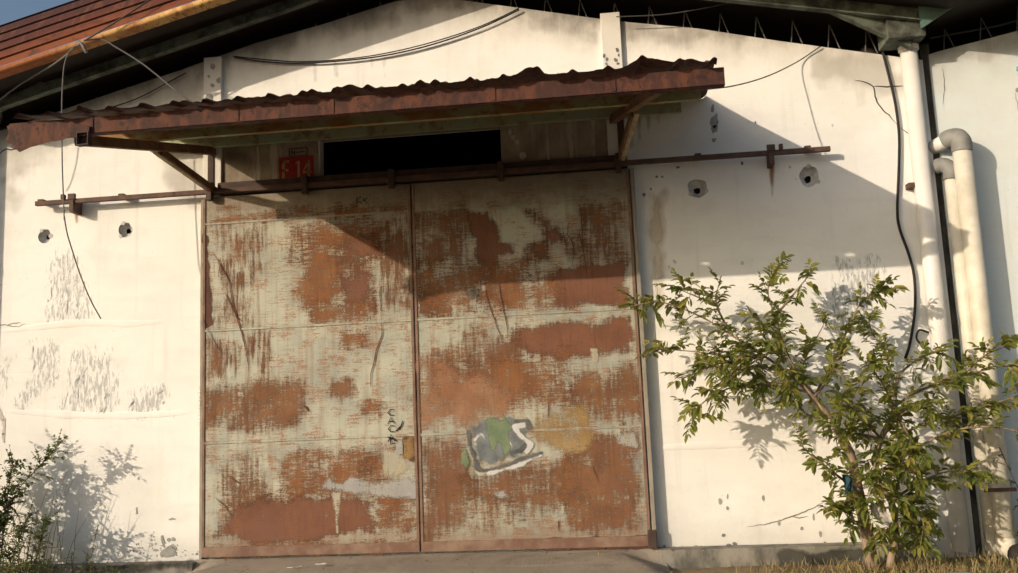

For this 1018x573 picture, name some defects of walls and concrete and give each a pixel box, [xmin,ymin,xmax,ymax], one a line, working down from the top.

rust [202,202,648,559]
crack [748,503,822,527]